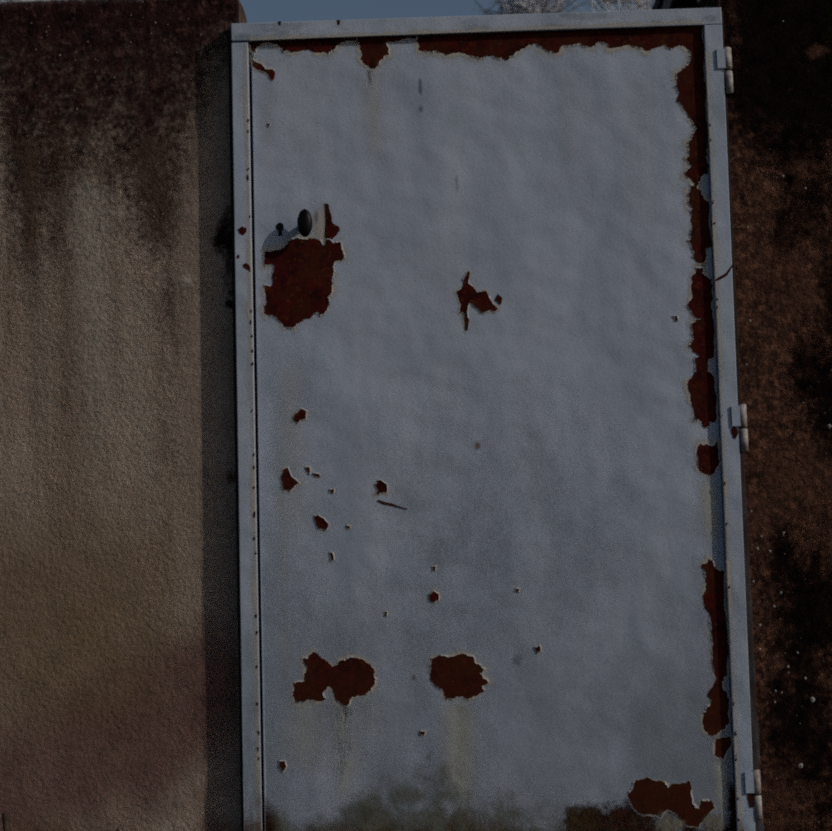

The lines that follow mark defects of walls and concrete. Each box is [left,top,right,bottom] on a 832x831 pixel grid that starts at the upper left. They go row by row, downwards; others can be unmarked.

leakage [0,0,239,561]
rust [248,26,723,429]
rust [280,466,302,493]
rust [313,513,330,531]
rust [374,479,390,496]
rust [695,439,728,532]
rust [428,589,441,603]
rust [291,649,378,777]
rust [428,651,491,790]
rust [567,556,754,831]